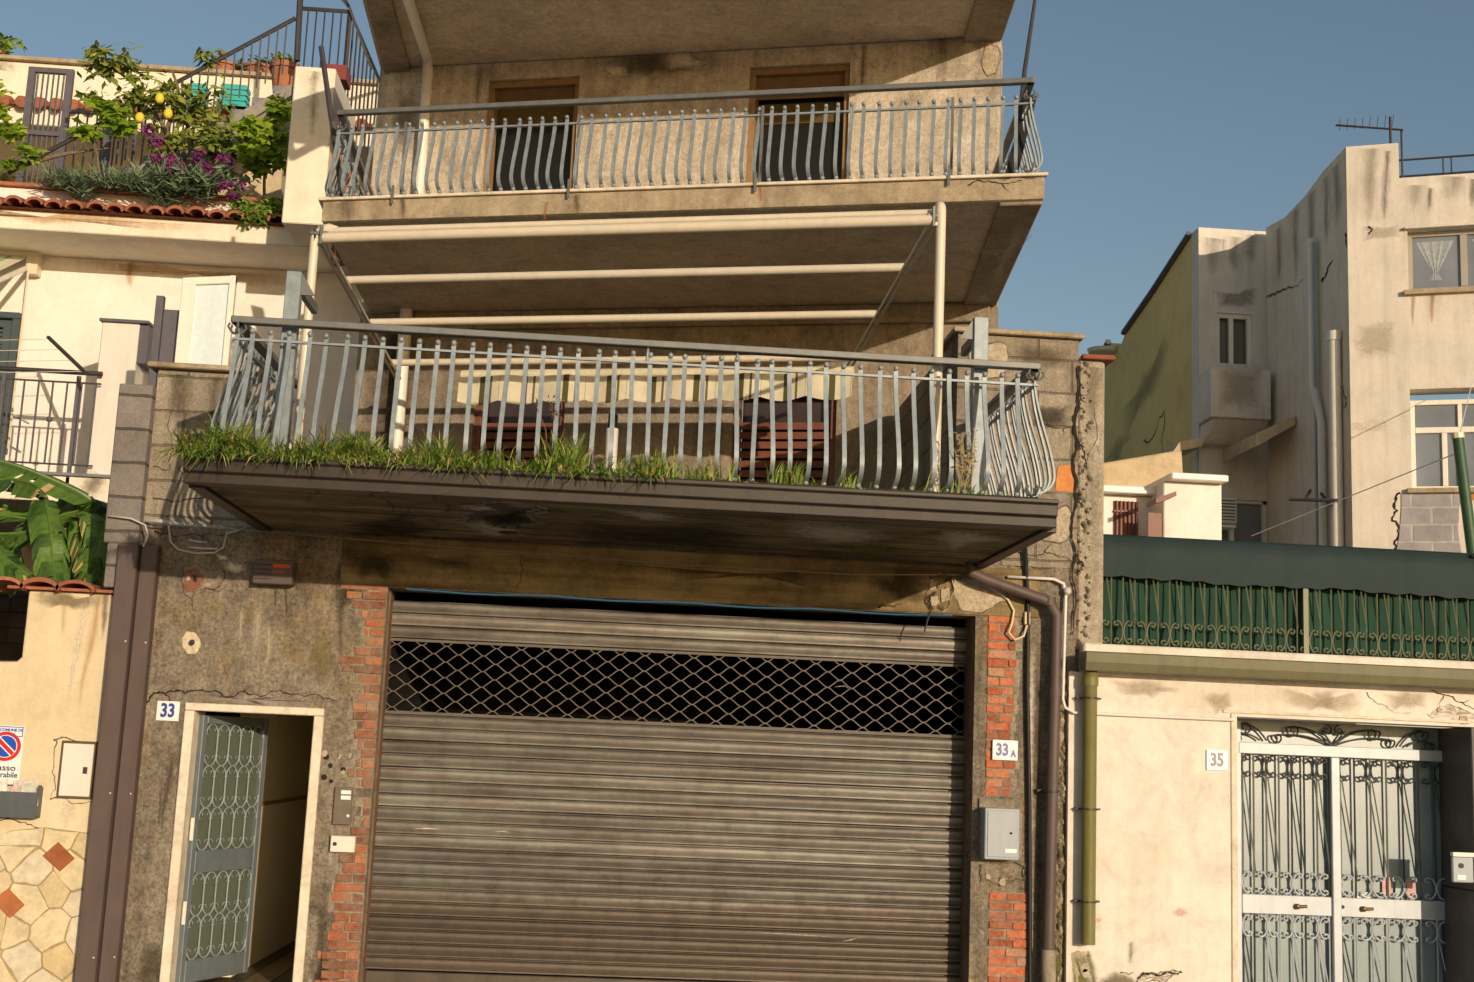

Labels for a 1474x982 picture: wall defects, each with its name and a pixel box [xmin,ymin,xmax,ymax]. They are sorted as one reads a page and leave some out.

leakage [799,526,871,544]
leakage [338,556,391,606]
leakage [882,576,917,598]
crack [1016,354,1098,982]
crack [147,689,335,706]
spalling [1136,969,1182,982]